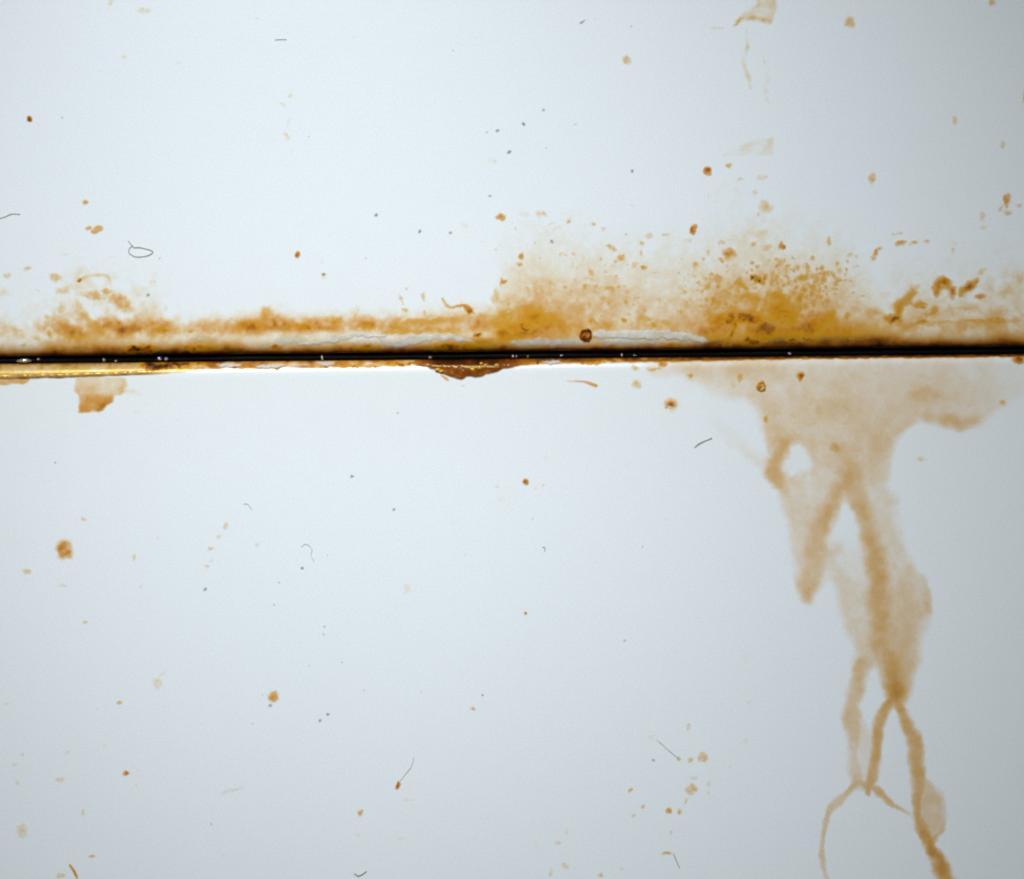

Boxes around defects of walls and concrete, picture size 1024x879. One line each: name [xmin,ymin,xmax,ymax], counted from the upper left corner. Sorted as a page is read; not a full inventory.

rust [0,242,1024,385]
rust [79,393,113,412]
rust [57,541,71,558]